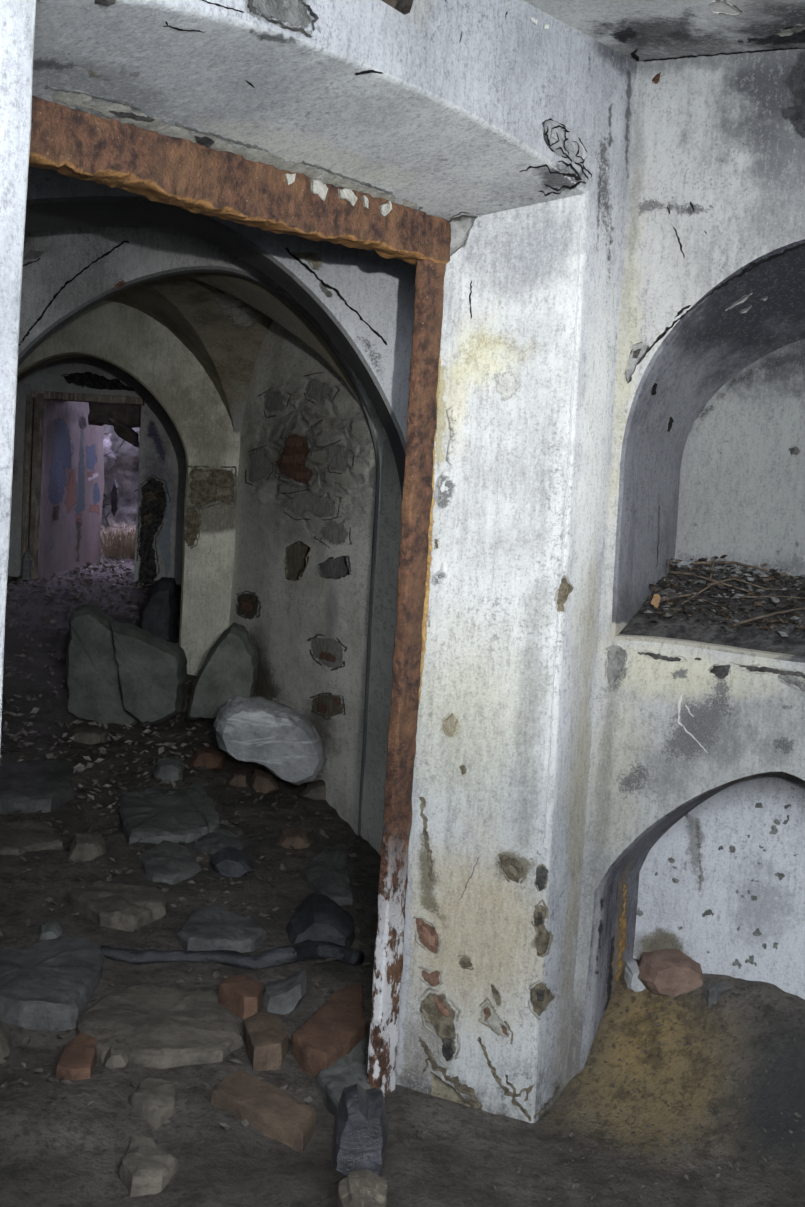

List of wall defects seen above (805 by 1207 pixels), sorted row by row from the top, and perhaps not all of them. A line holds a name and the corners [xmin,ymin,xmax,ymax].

crack [163,0,244,33]
spalling [247,0,319,38]
damp [601,12,696,49]
damp [738,31,805,45]
crack [520,161,592,196]
crack [285,248,387,345]
spalling [136,465,237,583]
corrosion [419,431,437,703]
spalling [496,852,553,957]
spalling [413,916,474,1107]
spalling [528,980,556,1020]
crack [419,1036,561,1122]